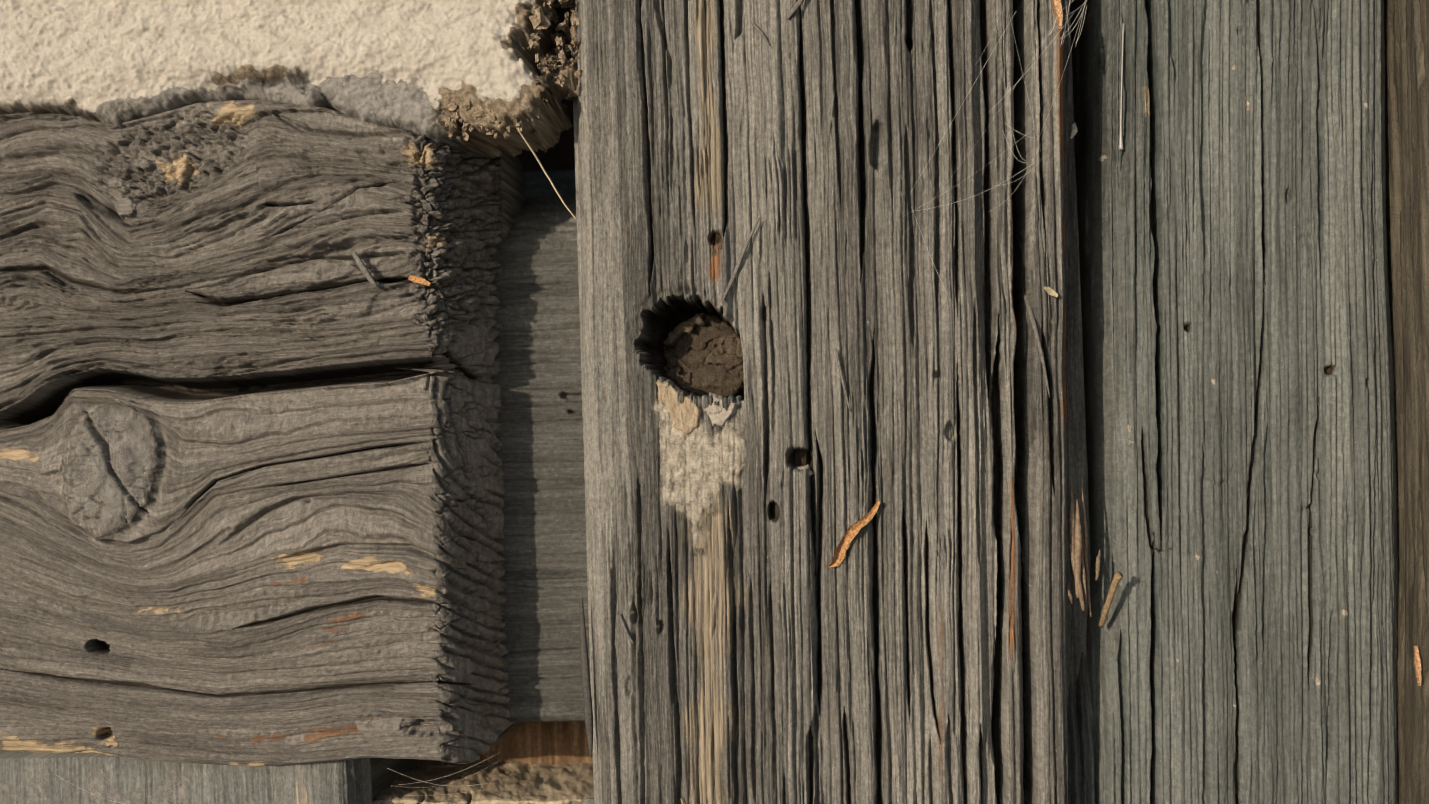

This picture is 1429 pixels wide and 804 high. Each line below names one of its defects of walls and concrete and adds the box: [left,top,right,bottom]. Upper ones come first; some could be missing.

spalling [441,0,582,141]
crack [1254,0,1262,54]
crack [0,346,484,529]
crack [1232,165,1266,804]